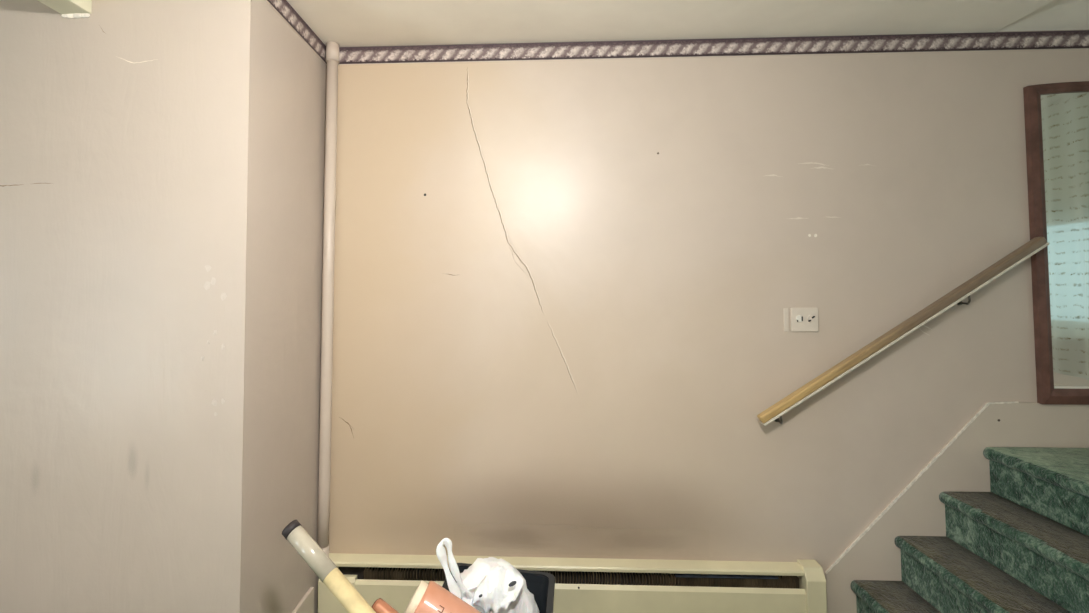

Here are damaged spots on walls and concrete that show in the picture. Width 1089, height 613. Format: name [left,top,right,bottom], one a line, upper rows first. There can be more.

crack [466,71,578,392]